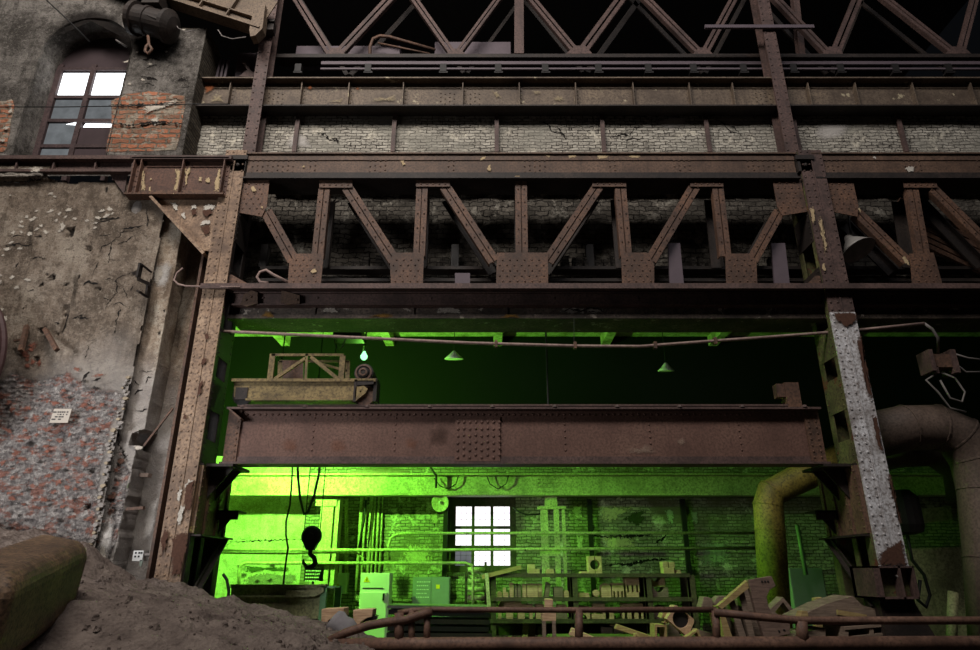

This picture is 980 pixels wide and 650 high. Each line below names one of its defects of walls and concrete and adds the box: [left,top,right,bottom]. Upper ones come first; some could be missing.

spalling [106,78,185,152]
peeling [173,167,221,192]
crack [3,235,45,267]
peeling [1,207,113,256]
crack [56,217,139,333]
peeling [810,208,828,271]
corrosion [834,312,857,327]
corrosion [857,336,873,398]
spalling [0,330,131,559]
corrosion [872,415,884,450]
corrosion [888,473,902,524]
corrosion [878,540,906,566]